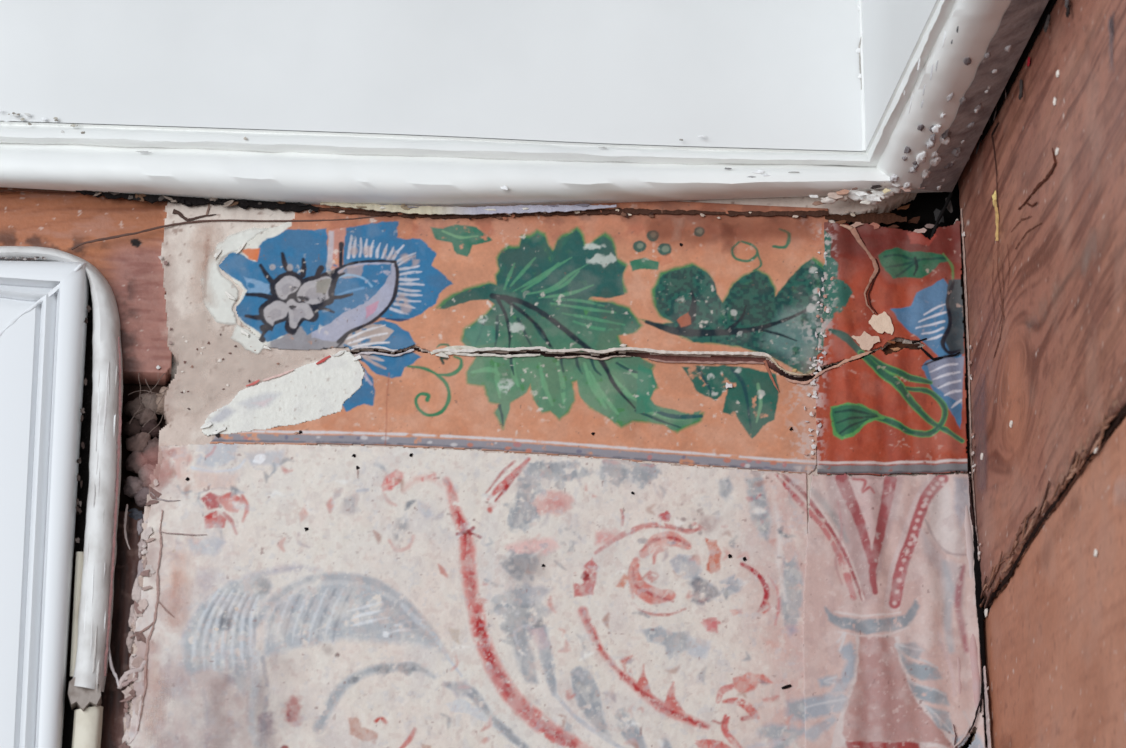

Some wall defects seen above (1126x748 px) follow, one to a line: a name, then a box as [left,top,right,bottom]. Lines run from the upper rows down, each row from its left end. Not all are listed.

peeling [792,47,997,233]
peeling [201,228,271,354]
peeling [200,350,365,438]
crack [350,344,884,392]
crack [912,338,960,361]
flaking render [118,474,162,748]